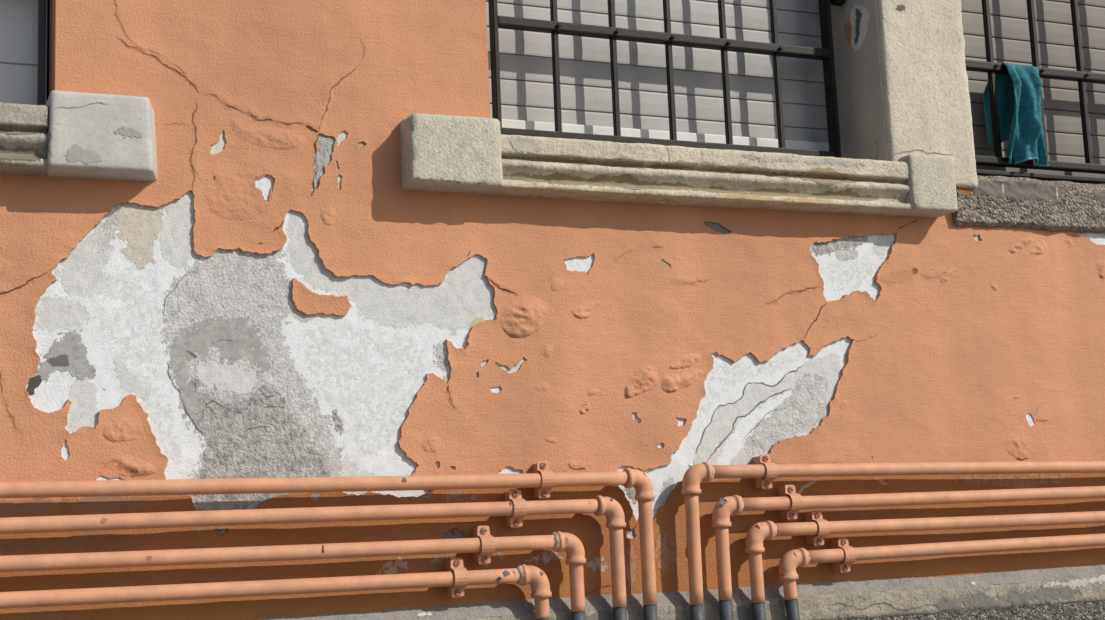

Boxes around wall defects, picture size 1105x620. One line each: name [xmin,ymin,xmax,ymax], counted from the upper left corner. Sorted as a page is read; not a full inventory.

crack [115,1,365,194]
peeling [311,131,367,191]
crack [0,269,51,294]
peeling [26,191,496,500]
peeling [564,254,594,273]
crack [768,288,825,337]
peeling [809,233,895,301]
peeling [1075,232,1105,245]
peeling [618,337,852,518]
crack [695,363,806,461]
peeling [188,493,290,511]
peeling [610,485,639,588]